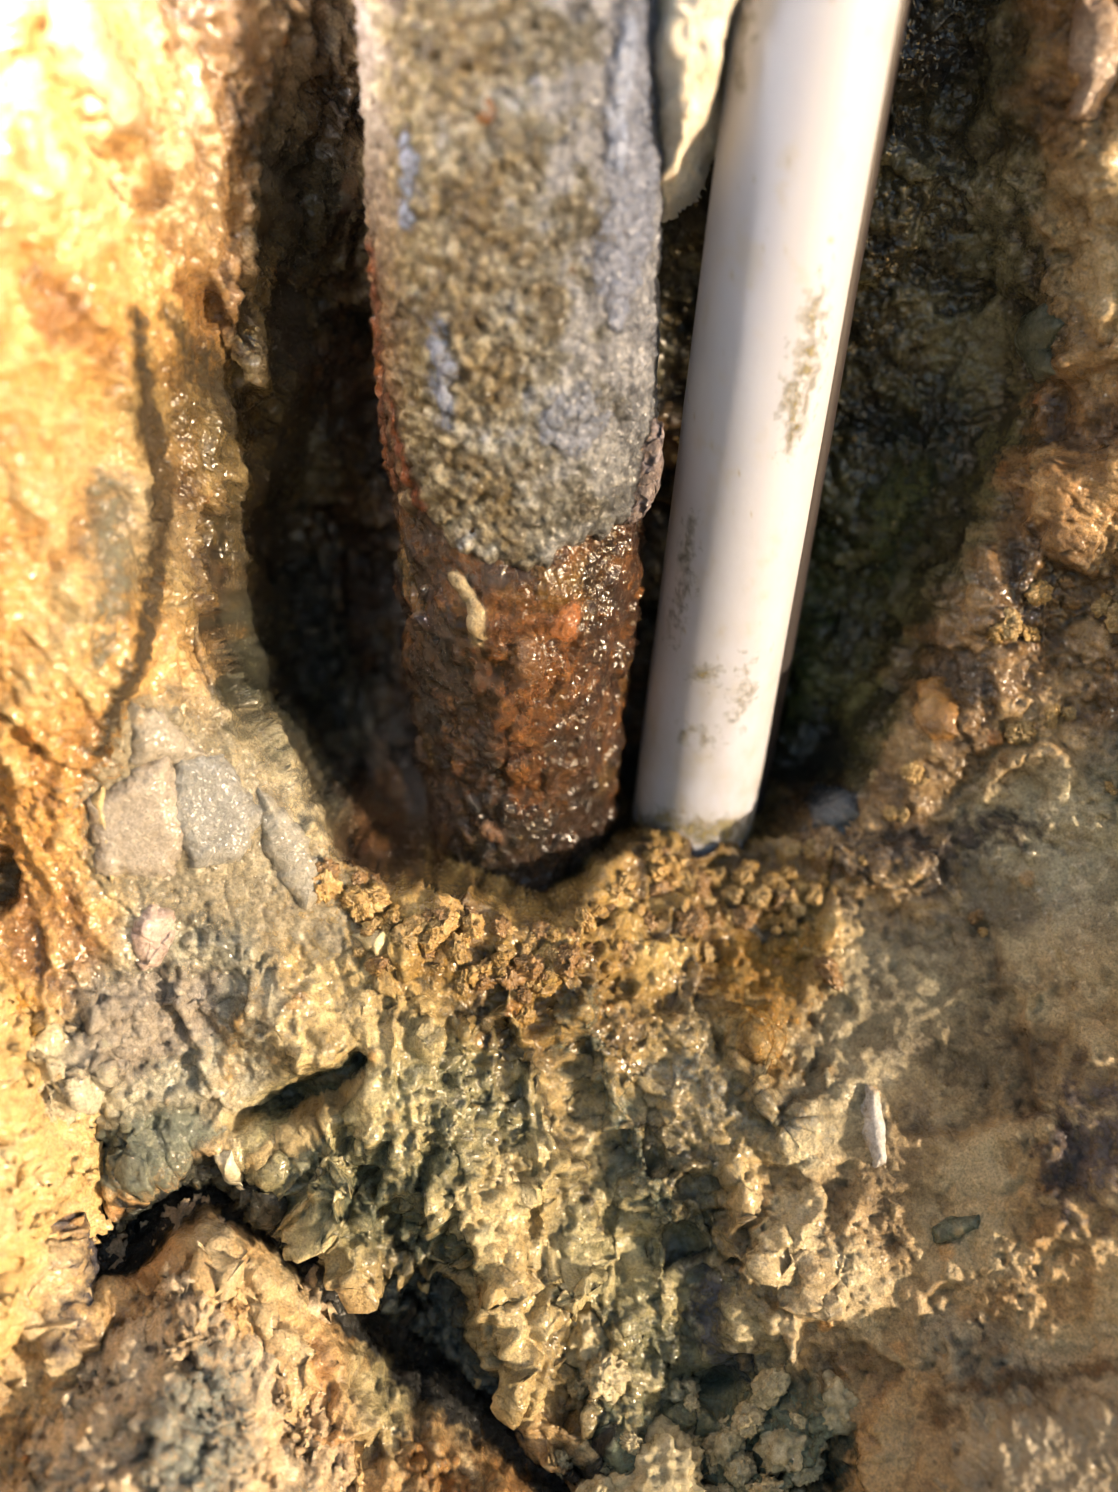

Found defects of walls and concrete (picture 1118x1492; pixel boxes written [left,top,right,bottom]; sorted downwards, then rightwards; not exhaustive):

rust [447,569,585,810]
rust [479,820,504,843]
crack [95,1183,621,1492]